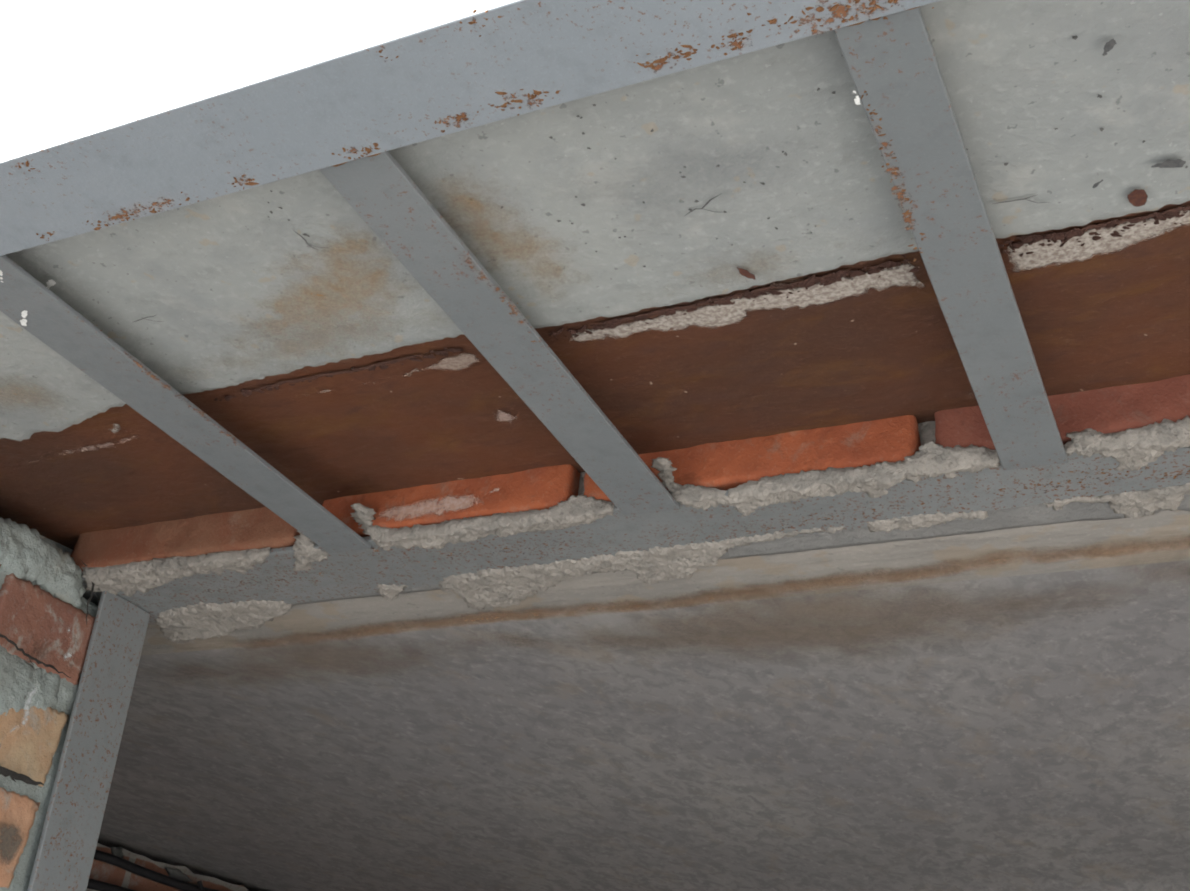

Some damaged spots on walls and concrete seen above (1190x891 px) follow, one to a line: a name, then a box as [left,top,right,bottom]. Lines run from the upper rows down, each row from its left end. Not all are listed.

rust [633,0,899,72]
rust [331,143,379,159]
rust [861,91,924,262]
rust [86,192,199,230]
flaking render [998,207,1190,271]
flaking render [549,255,924,341]
flaking render [404,354,477,376]
crack [0,634,71,678]